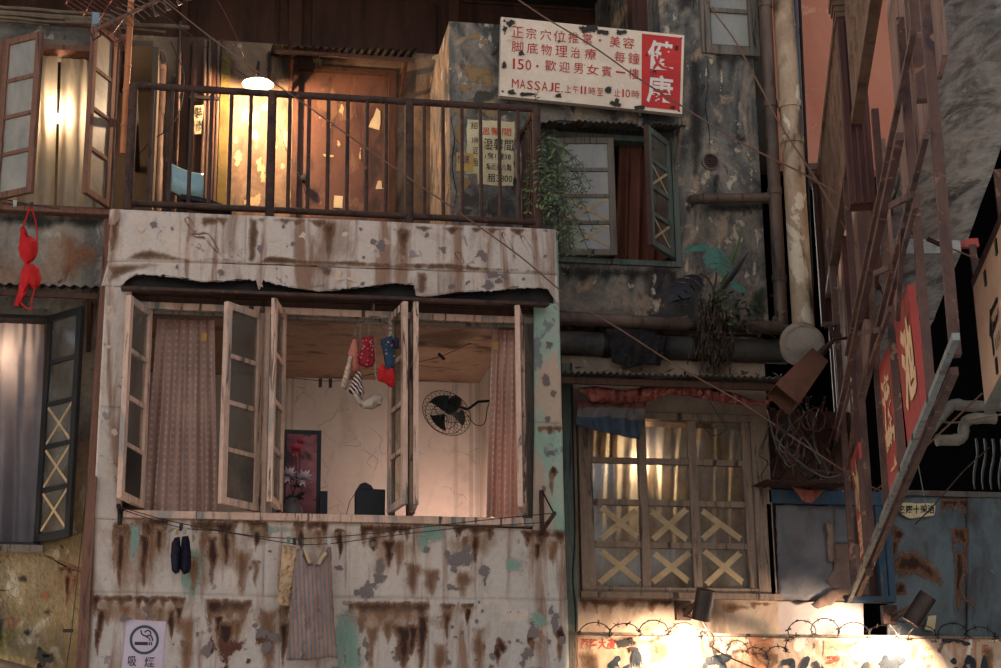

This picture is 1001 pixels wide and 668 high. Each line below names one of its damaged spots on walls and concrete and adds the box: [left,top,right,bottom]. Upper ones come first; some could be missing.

peeling [542,373,557,397]
corrosion [293,522,346,560]
peeling [354,558,387,600]
corrosion [360,524,411,573]
peeling [444,545,490,586]
corrosion [453,525,494,562]
corrosion [521,530,566,563]
corrosion [892,525,943,595]
corrosion [344,601,429,668]
corrosion [441,603,474,638]
corrosion [494,637,507,666]
corrosion [555,626,566,660]